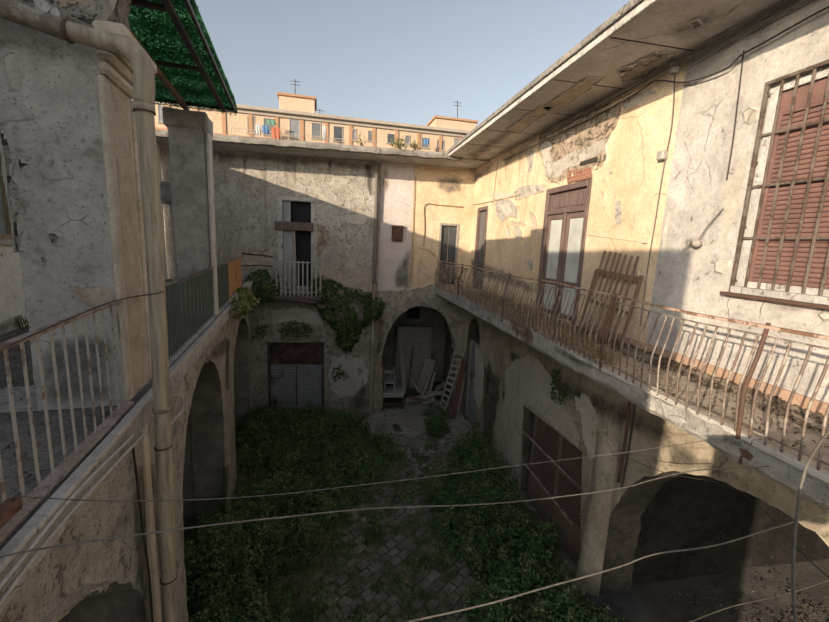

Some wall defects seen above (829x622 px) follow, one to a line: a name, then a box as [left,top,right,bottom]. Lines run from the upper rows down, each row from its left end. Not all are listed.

flaking render [19,0,131,32]
flaking render [490,50,680,250]